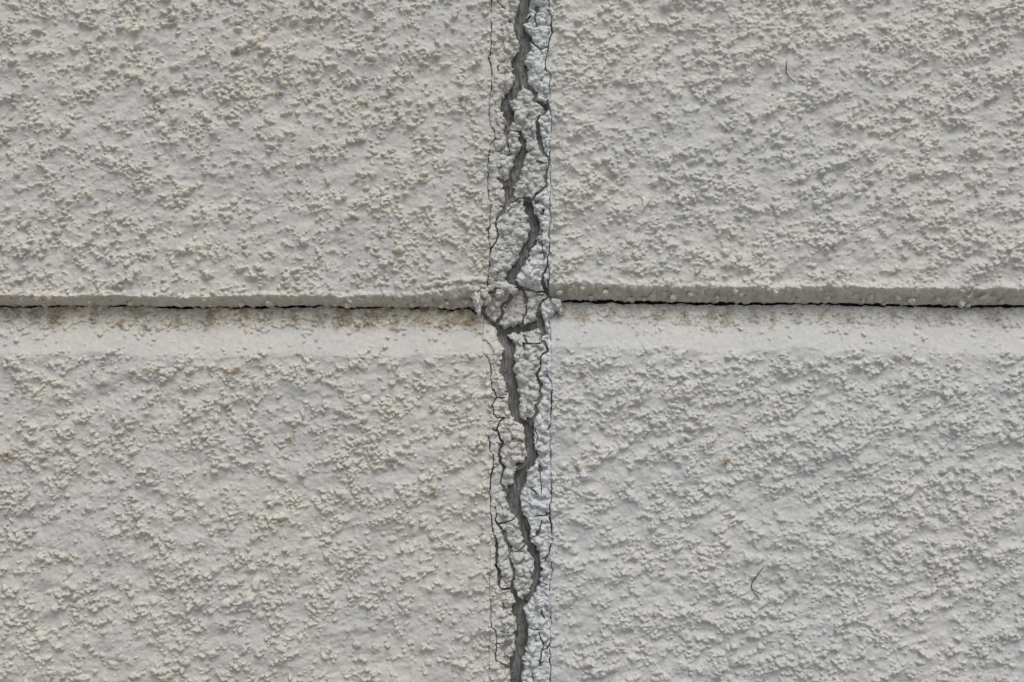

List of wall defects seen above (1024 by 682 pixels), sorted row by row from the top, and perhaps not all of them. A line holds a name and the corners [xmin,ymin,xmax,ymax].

crack [0,302,84,310]
crack [157,303,394,311]
crack [409,0,1024,682]